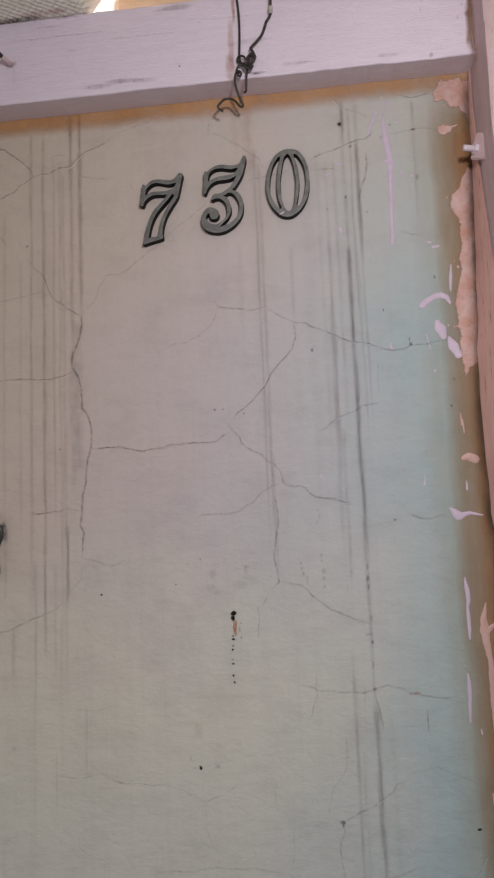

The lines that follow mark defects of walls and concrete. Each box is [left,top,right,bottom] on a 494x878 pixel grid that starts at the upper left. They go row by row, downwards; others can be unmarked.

peeling [438,124,457,135]
peeling [433,77,469,120]
peeling [446,166,478,376]
crack [0,302,445,636]